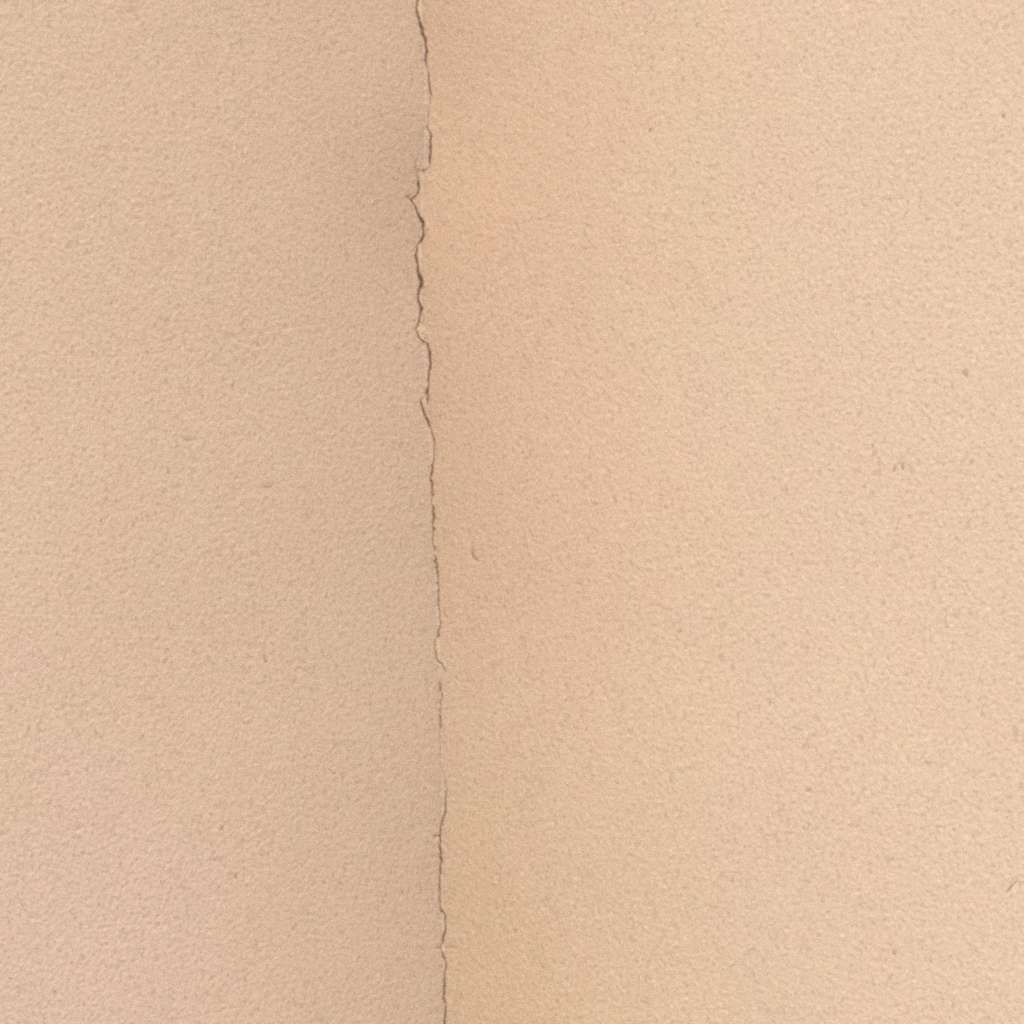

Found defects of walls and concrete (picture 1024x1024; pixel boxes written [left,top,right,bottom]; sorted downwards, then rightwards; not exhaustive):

crack [406,0,449,1024]